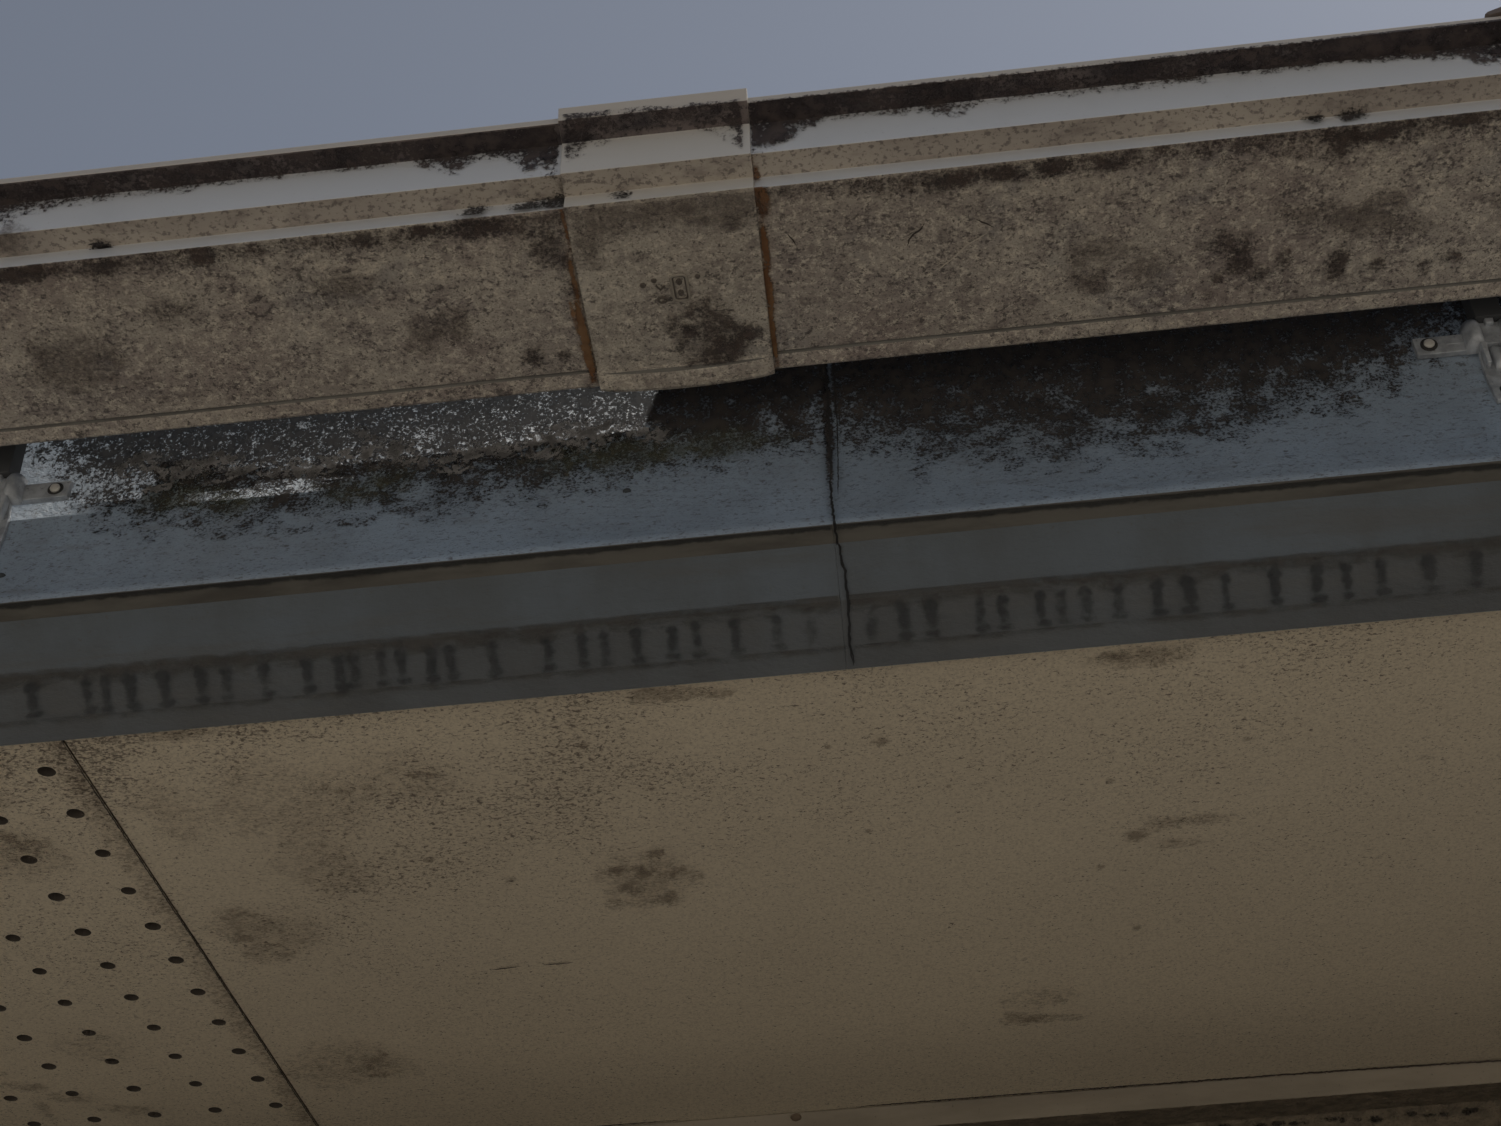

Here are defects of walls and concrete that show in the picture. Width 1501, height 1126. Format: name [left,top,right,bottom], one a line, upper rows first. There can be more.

corrosion [560,209,596,383]
water stain [0,19,1501,300]
corrosion [754,186,779,364]
water stain [25,297,1467,545]
crack [824,363,855,665]